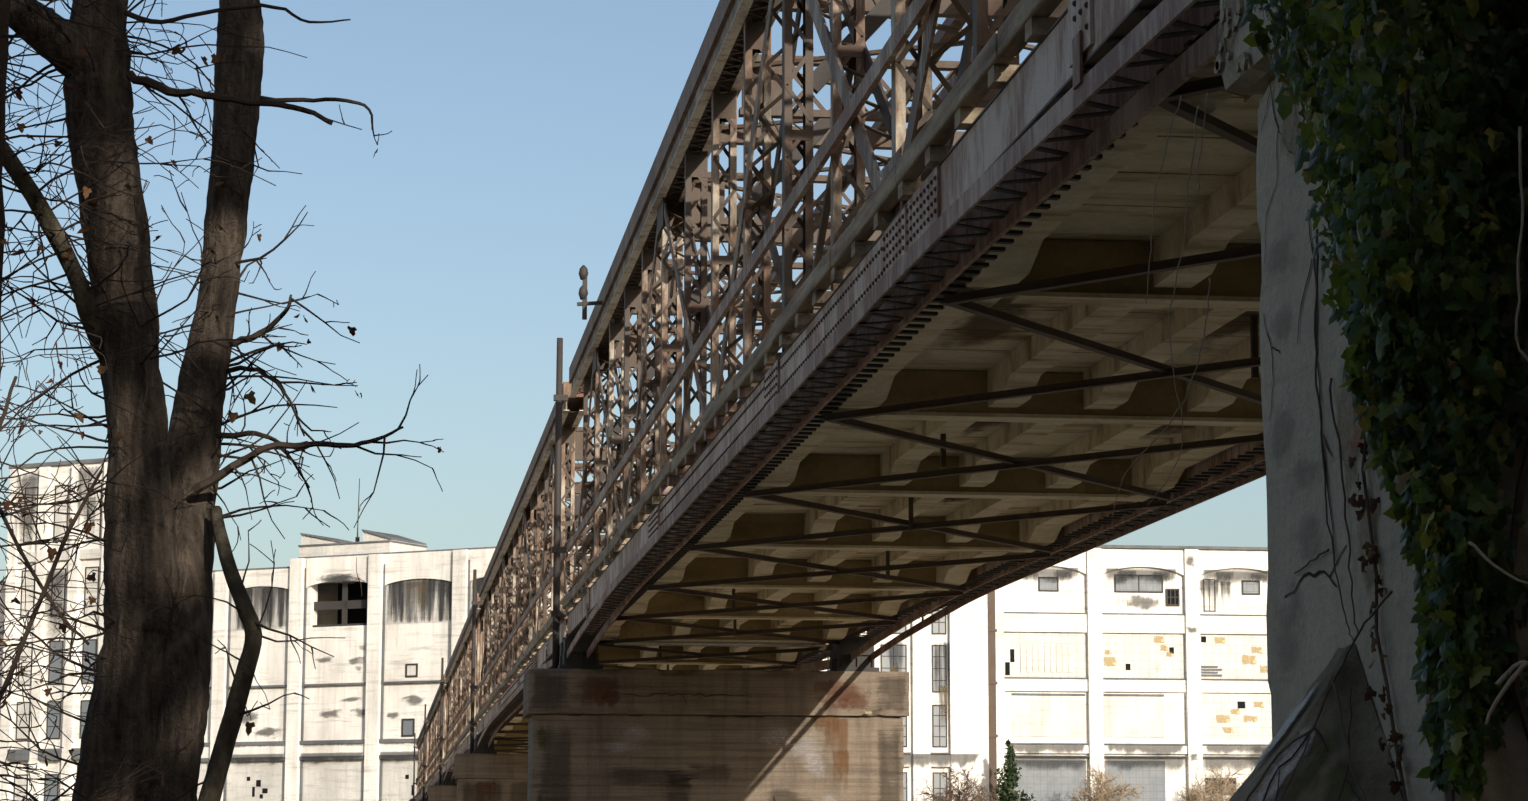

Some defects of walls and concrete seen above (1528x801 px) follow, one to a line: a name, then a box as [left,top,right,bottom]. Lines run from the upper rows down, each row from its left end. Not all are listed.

crack [1261,79,1292,262]
crack [1263,210,1347,598]
corrosion [815,682,865,770]